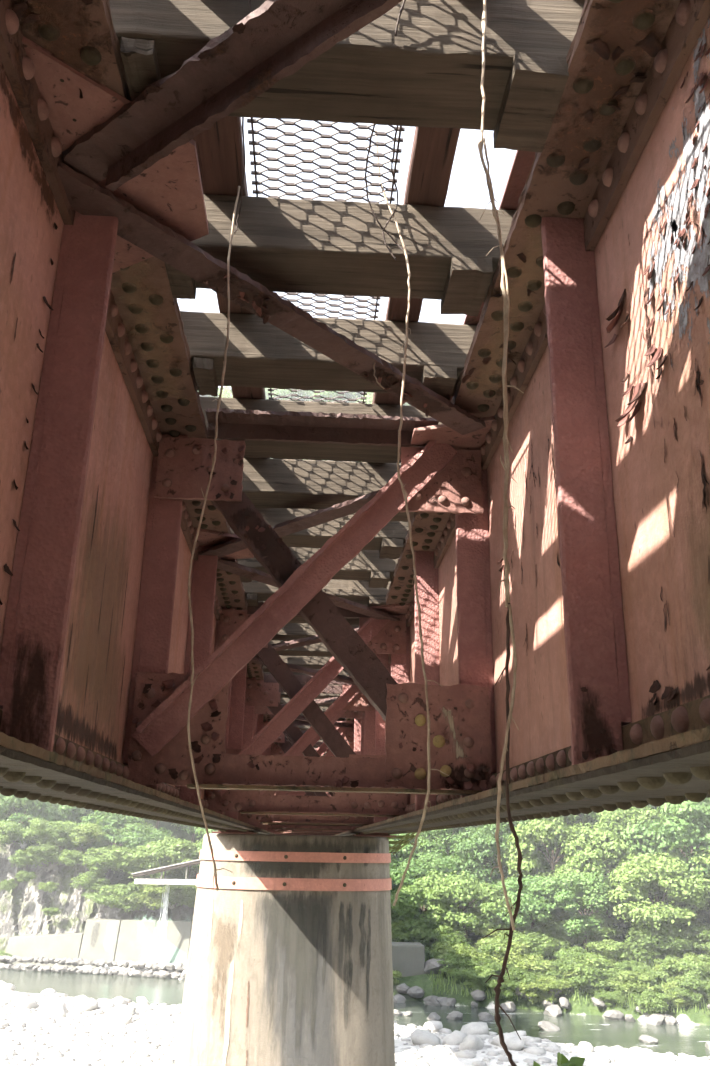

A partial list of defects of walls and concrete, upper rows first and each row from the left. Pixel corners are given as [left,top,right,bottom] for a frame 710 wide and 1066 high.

peeling [644,9,710,356]
peeling [604,290,629,348]
peeling [615,344,672,427]
water stain [208,900,243,1066]
water stain [262,894,371,1066]